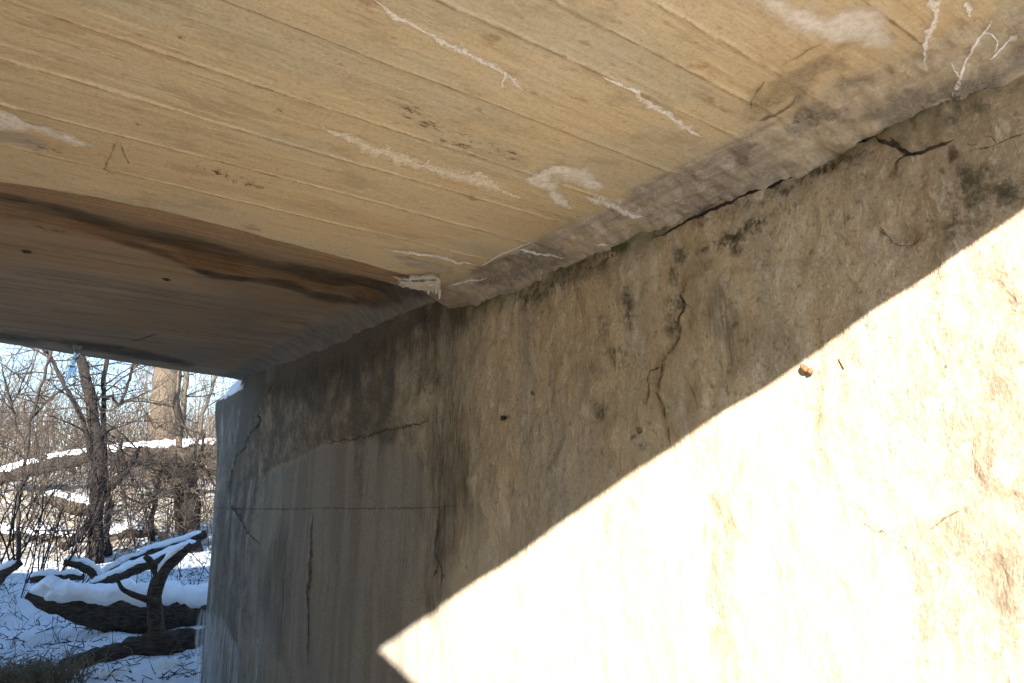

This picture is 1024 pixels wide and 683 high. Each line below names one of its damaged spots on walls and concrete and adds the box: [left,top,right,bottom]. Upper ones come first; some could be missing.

water stain [375,0,524,91]
water stain [922,0,940,70]
water stain [952,20,1018,96]
water stain [0,111,90,149]
water stain [316,121,522,198]
water stain [526,166,649,221]
water stain [603,77,701,137]
crack [649,177,792,239]
water stain [380,240,563,286]
crack [646,275,689,442]
crack [228,386,272,542]
crack [305,516,313,665]